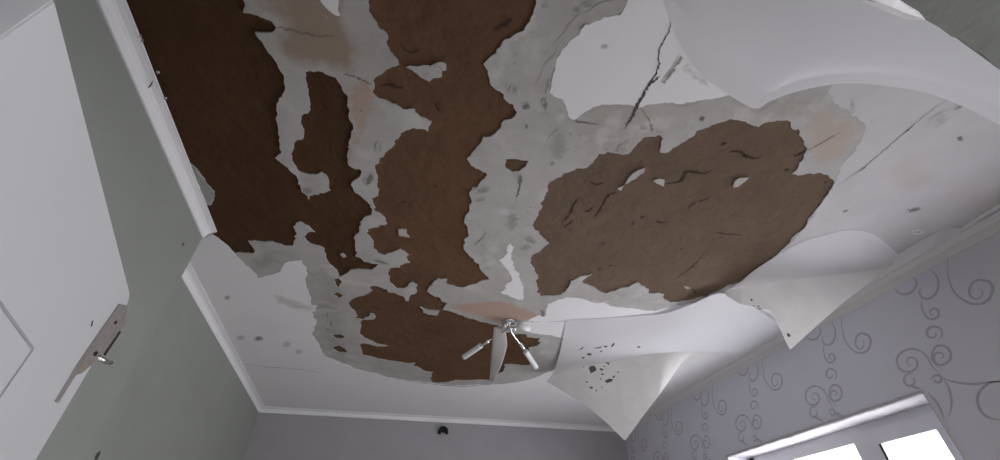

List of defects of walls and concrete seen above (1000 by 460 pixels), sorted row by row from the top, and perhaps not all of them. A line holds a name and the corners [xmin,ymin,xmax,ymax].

crack [625,23,671,129]
flaking render [126,0,1000,383]
crack [837,101,945,186]
leakage [445,299,546,326]